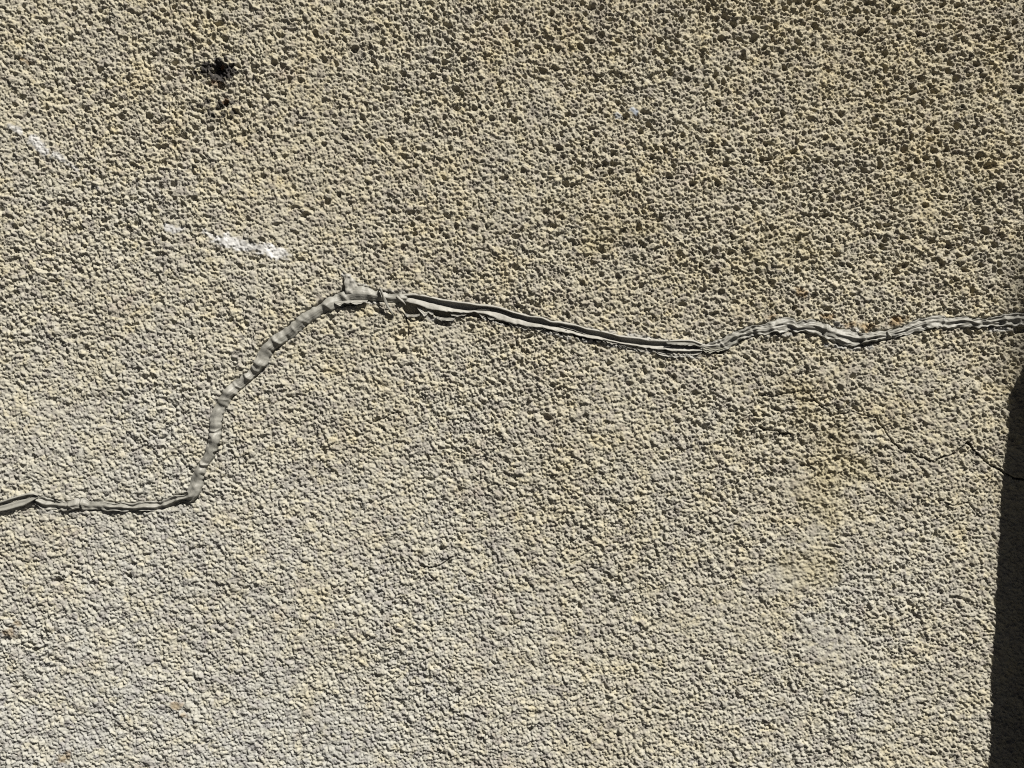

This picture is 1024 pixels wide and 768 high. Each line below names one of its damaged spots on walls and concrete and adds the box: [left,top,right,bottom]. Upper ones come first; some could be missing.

crack [0,271,1024,515]